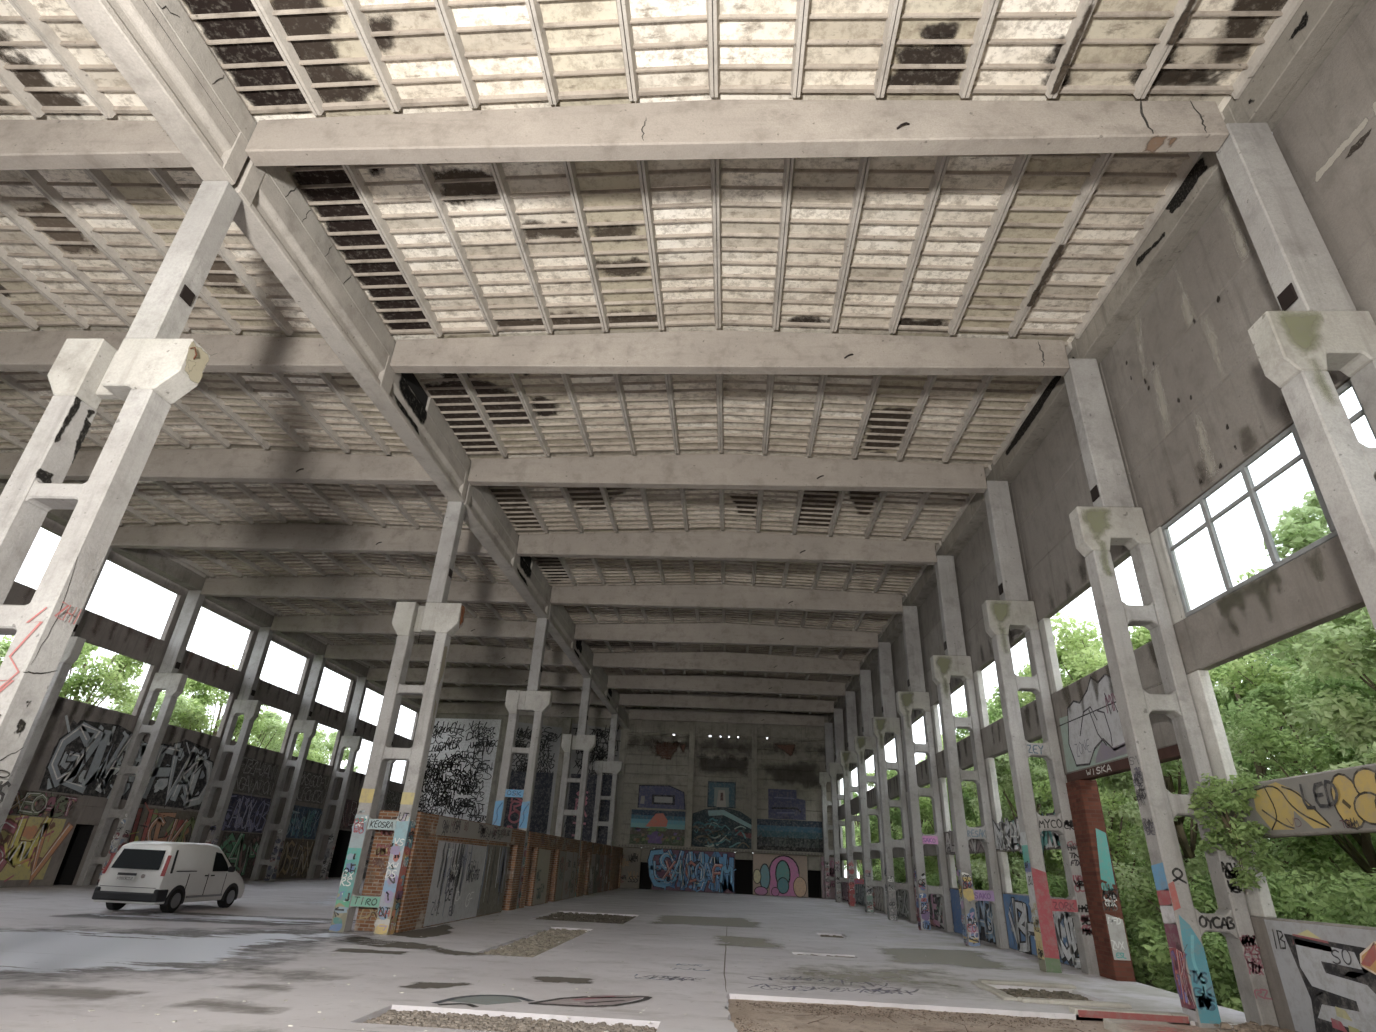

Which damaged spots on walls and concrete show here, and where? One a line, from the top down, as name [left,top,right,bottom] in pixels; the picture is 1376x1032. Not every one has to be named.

spalling [1289,11,1308,40]
crack [1140,100,1154,134]
spalling [1315,101,1376,182]